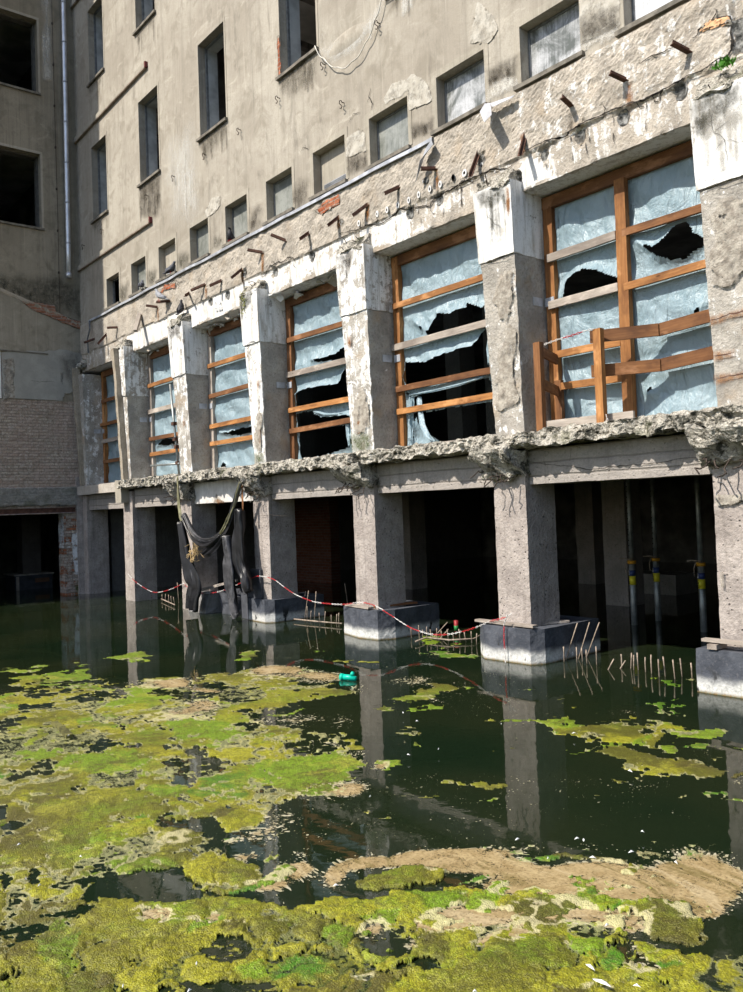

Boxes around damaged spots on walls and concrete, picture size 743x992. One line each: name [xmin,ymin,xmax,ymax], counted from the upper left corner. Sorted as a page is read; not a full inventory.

spalling [699,15,743,54]
flaking render [384,74,432,110]
spalling [117,403,743,509]